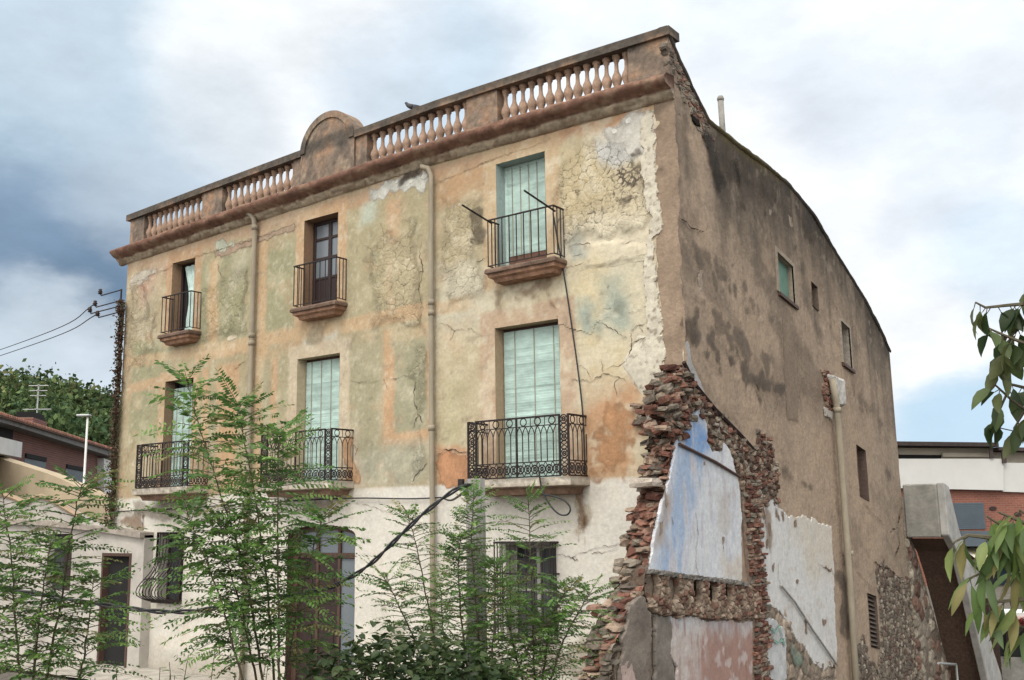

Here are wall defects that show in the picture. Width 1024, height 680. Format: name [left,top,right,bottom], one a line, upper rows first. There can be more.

peeling [369,171,428,201]
crack [555,141,649,267]
flaking render [603,41,715,372]
damp [704,131,725,190]
crack [356,142,541,481]
crack [575,306,645,394]
damp [680,309,785,399]
flaking render [820,369,846,420]
flaking render [436,451,467,488]
spalling [573,404,676,677]
flaking render [764,607,837,680]